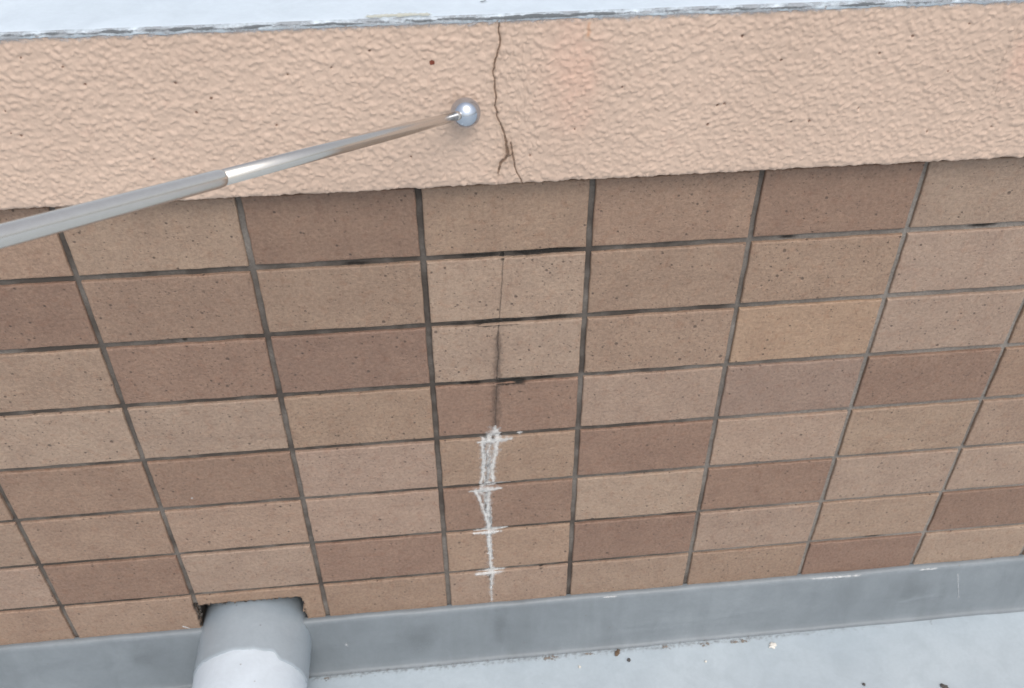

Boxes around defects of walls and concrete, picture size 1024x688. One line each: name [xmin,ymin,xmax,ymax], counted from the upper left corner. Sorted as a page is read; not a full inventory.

crack [485,20,523,184]